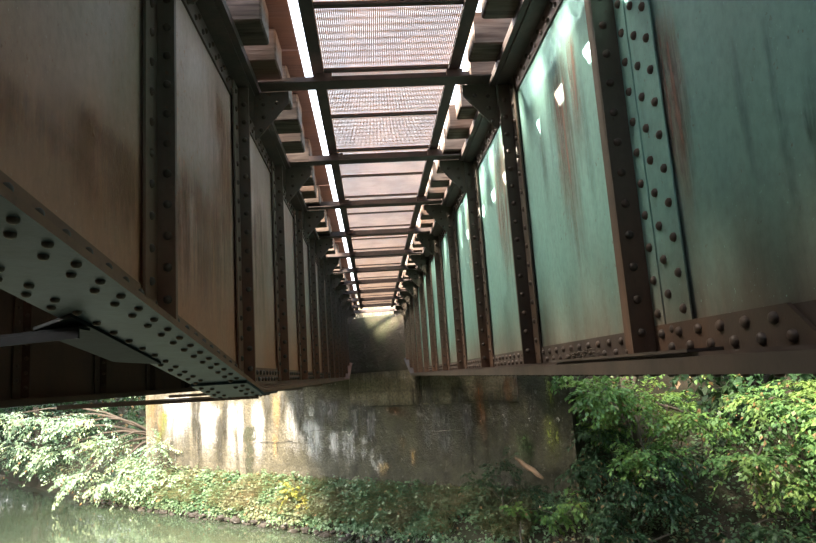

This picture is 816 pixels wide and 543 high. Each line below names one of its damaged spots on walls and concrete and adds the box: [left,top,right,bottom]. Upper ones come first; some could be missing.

rust [656,23,685,154]
damp [254,395,270,439]
damp [280,391,337,451]
damp [330,403,375,453]